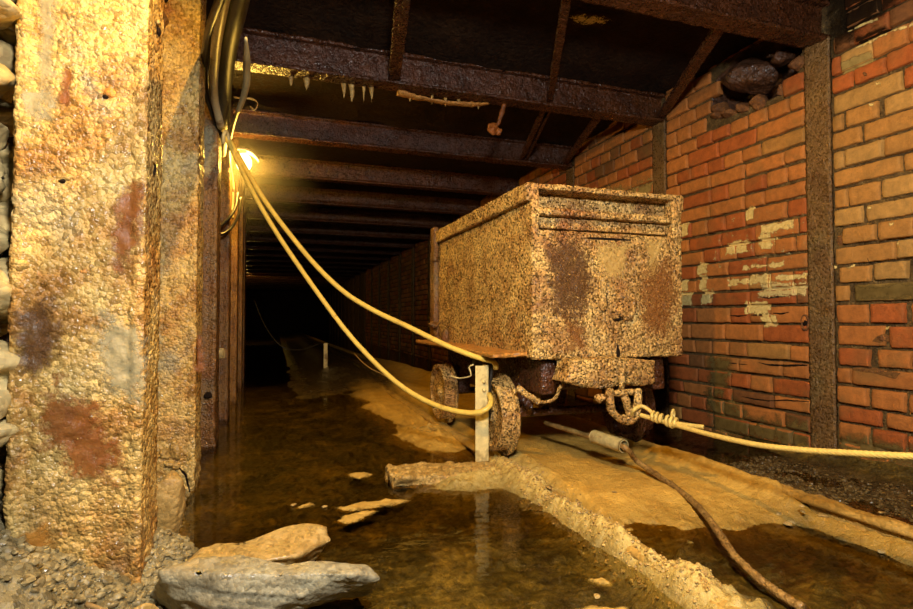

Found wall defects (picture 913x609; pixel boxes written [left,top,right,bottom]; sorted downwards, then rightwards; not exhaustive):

damp [681,206,808,328]
corrosion [41,377,121,478]